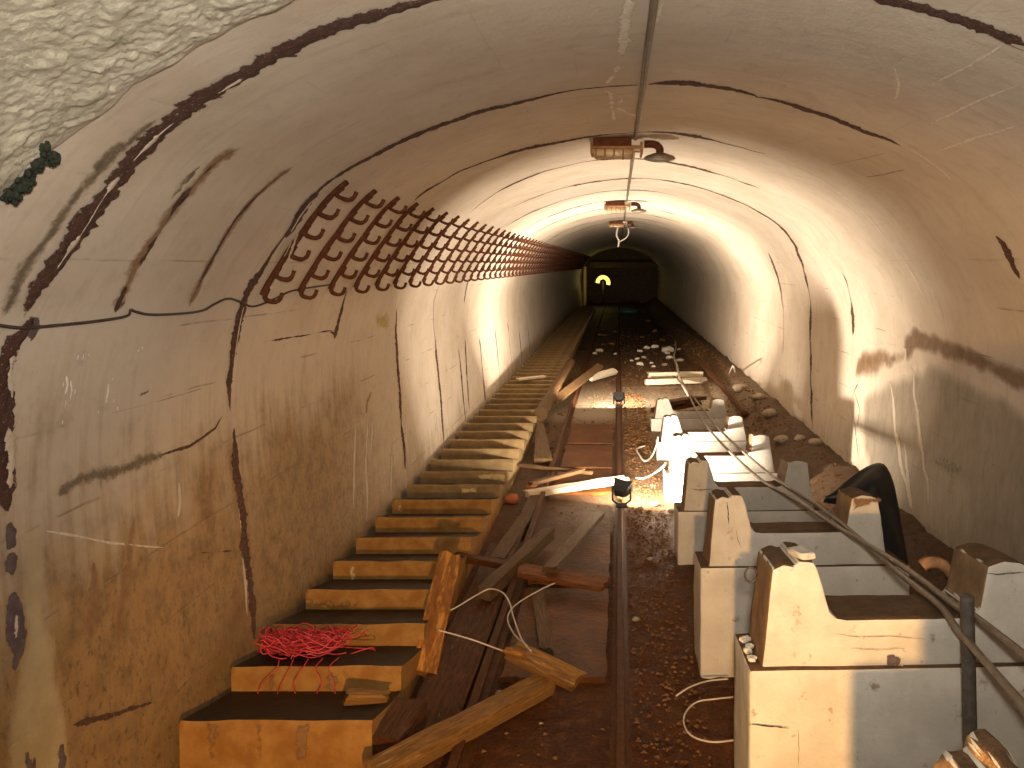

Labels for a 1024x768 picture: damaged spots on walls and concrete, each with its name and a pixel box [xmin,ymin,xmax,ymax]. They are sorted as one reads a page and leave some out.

crack [874,0,1024,85]
crack [0,0,439,511]
crack [42,80,1022,639]
leakage [853,321,1024,564]
flaking render [5,522,18,575]
flaking render [6,592,27,670]
crack [73,702,152,727]